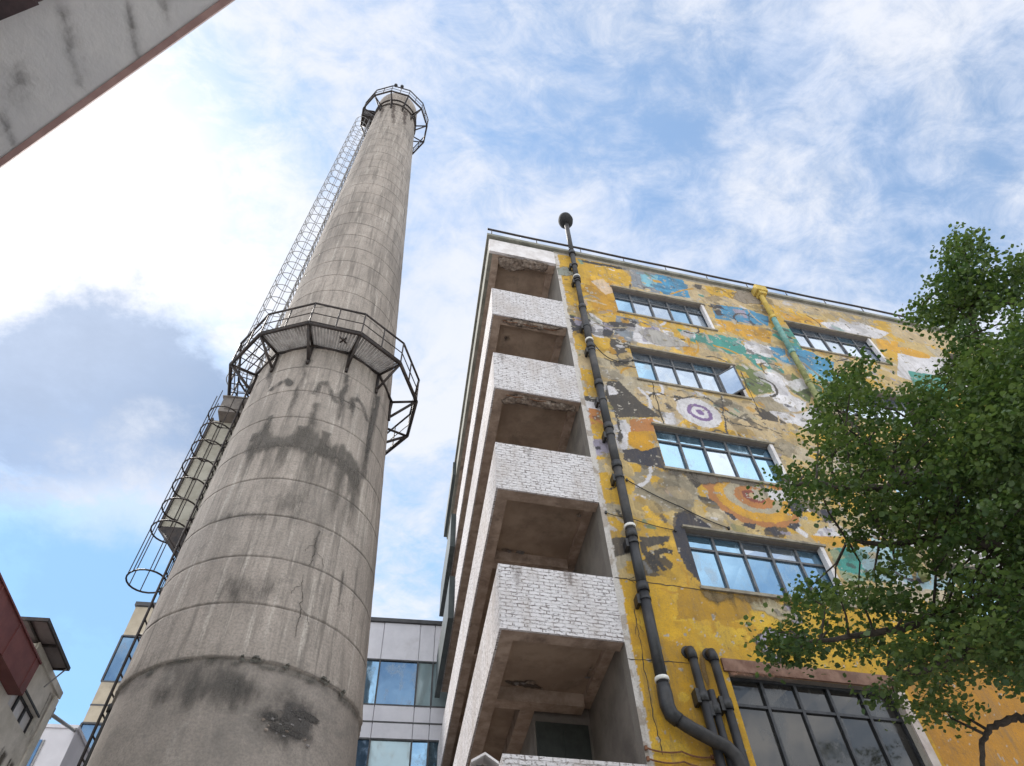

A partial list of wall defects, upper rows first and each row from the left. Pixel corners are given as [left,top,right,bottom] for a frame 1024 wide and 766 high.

spalling [498,257,574,276]
spalling [503,319,563,331]
spalling [501,394,576,412]
leakage [247,375,380,510]
crack [291,538,324,636]
spalling [262,700,319,747]